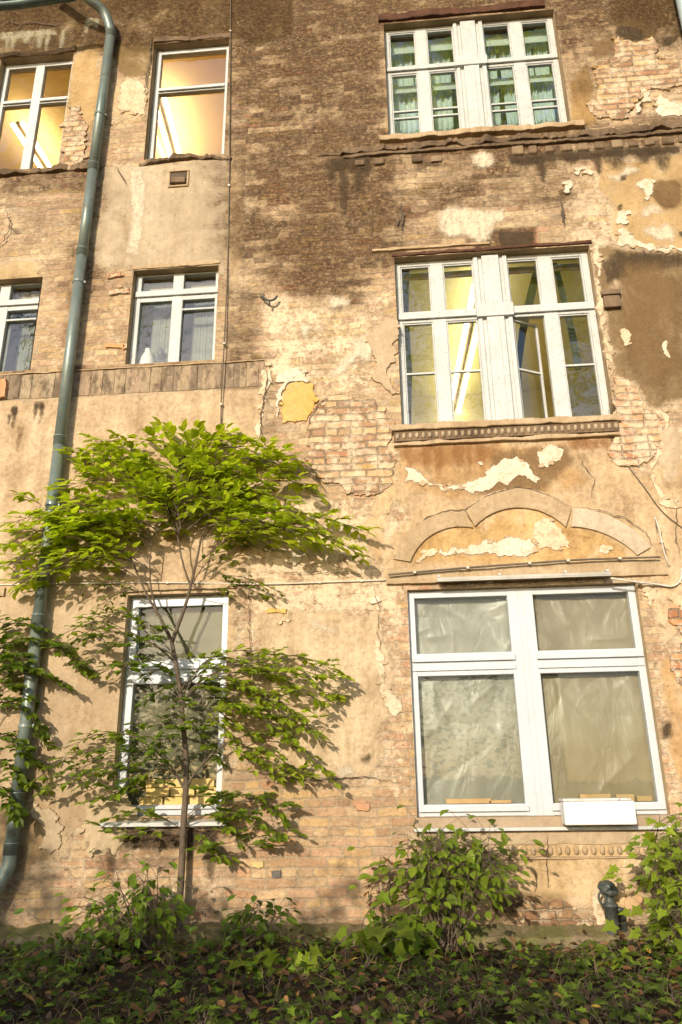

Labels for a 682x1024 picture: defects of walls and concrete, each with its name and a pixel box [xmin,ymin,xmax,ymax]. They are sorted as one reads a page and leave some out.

flaking render [585,35,682,121]
flaking render [59,105,89,169]
leakage [325,156,370,213]
flaking render [562,166,594,195]
flaking render [608,167,682,254]
leakage [603,251,682,384]
flaking render [255,362,309,439]
flaking render [588,245,682,509]
flaking render [293,393,564,497]
flaking render [415,517,570,563]
crack [393,458,680,557]
flaking render [373,638,402,717]